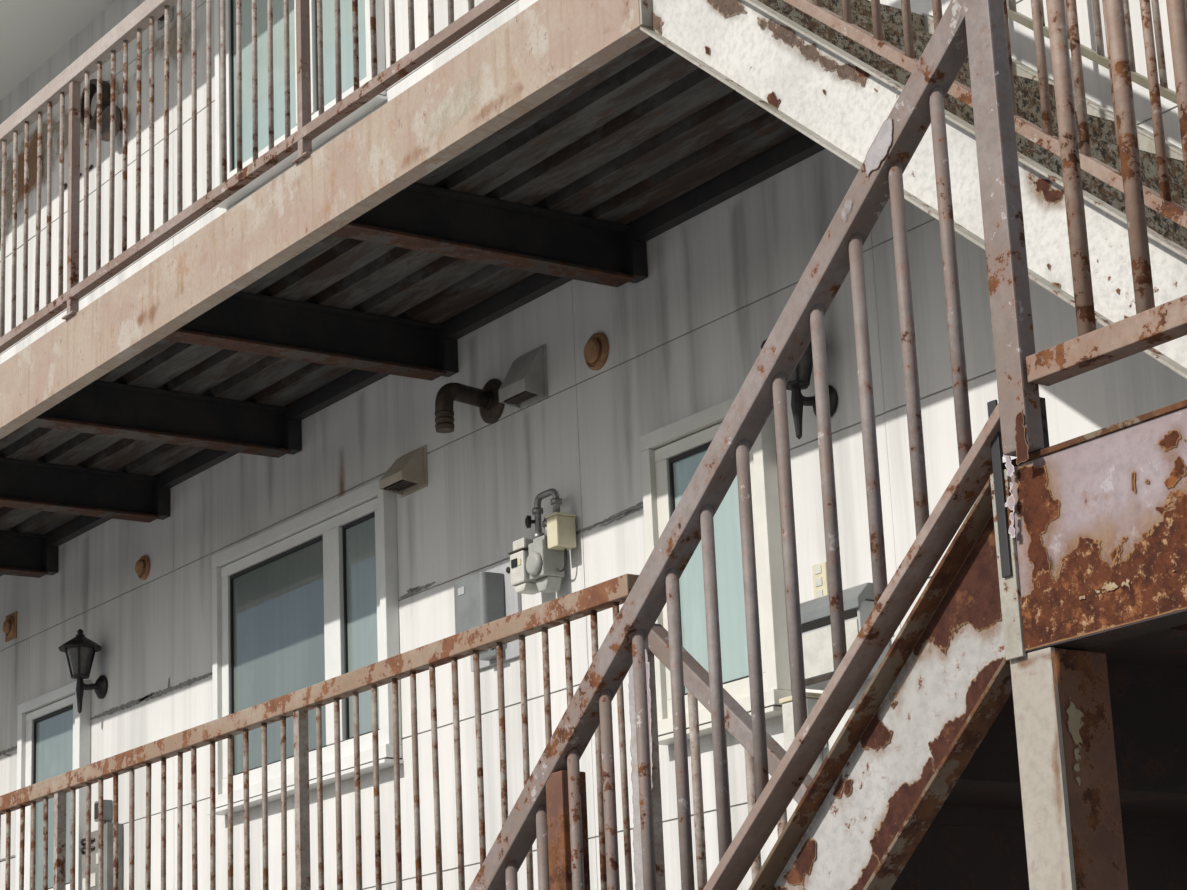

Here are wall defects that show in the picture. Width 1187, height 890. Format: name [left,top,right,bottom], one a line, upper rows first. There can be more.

rust [913,513,1002,656]
rust [1015,408,1187,674]
rust [833,773,852,798]
rust [849,657,1004,890]
rust [770,838,816,890]